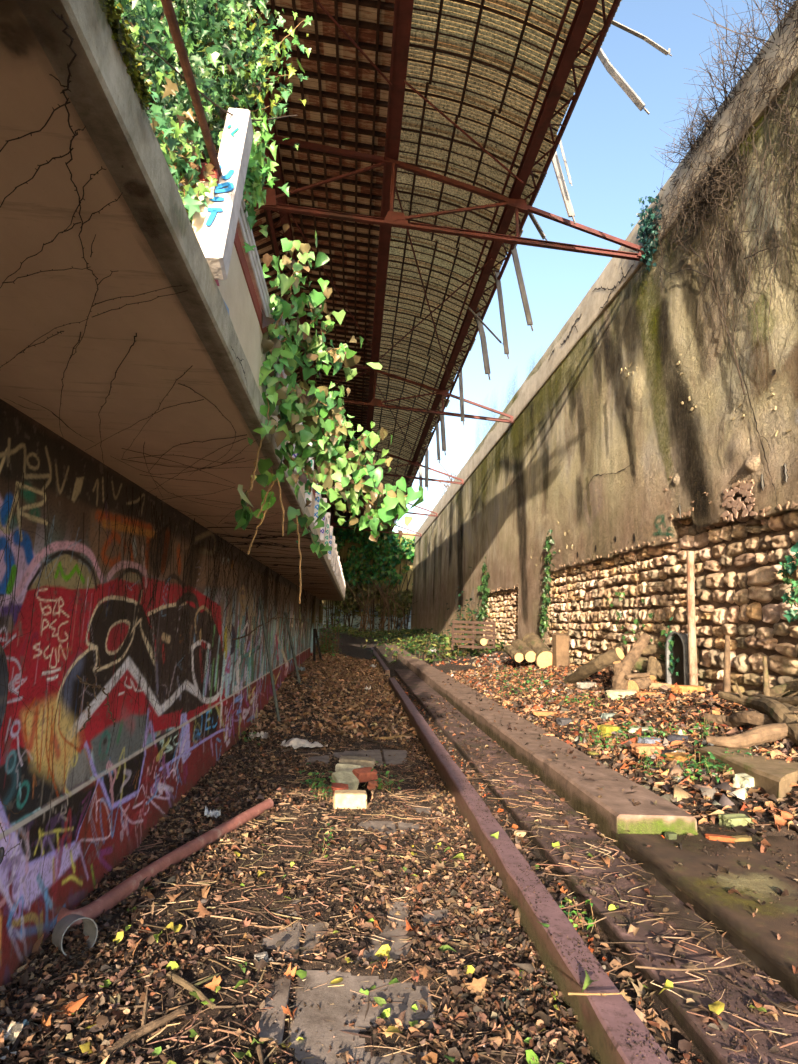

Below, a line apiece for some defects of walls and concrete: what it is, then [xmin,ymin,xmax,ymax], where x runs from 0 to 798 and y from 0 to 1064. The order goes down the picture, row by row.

leakage [678,260,697,319]
leakage [413,369,585,618]
leakage [592,290,709,529]
spalling [704,479,798,521]